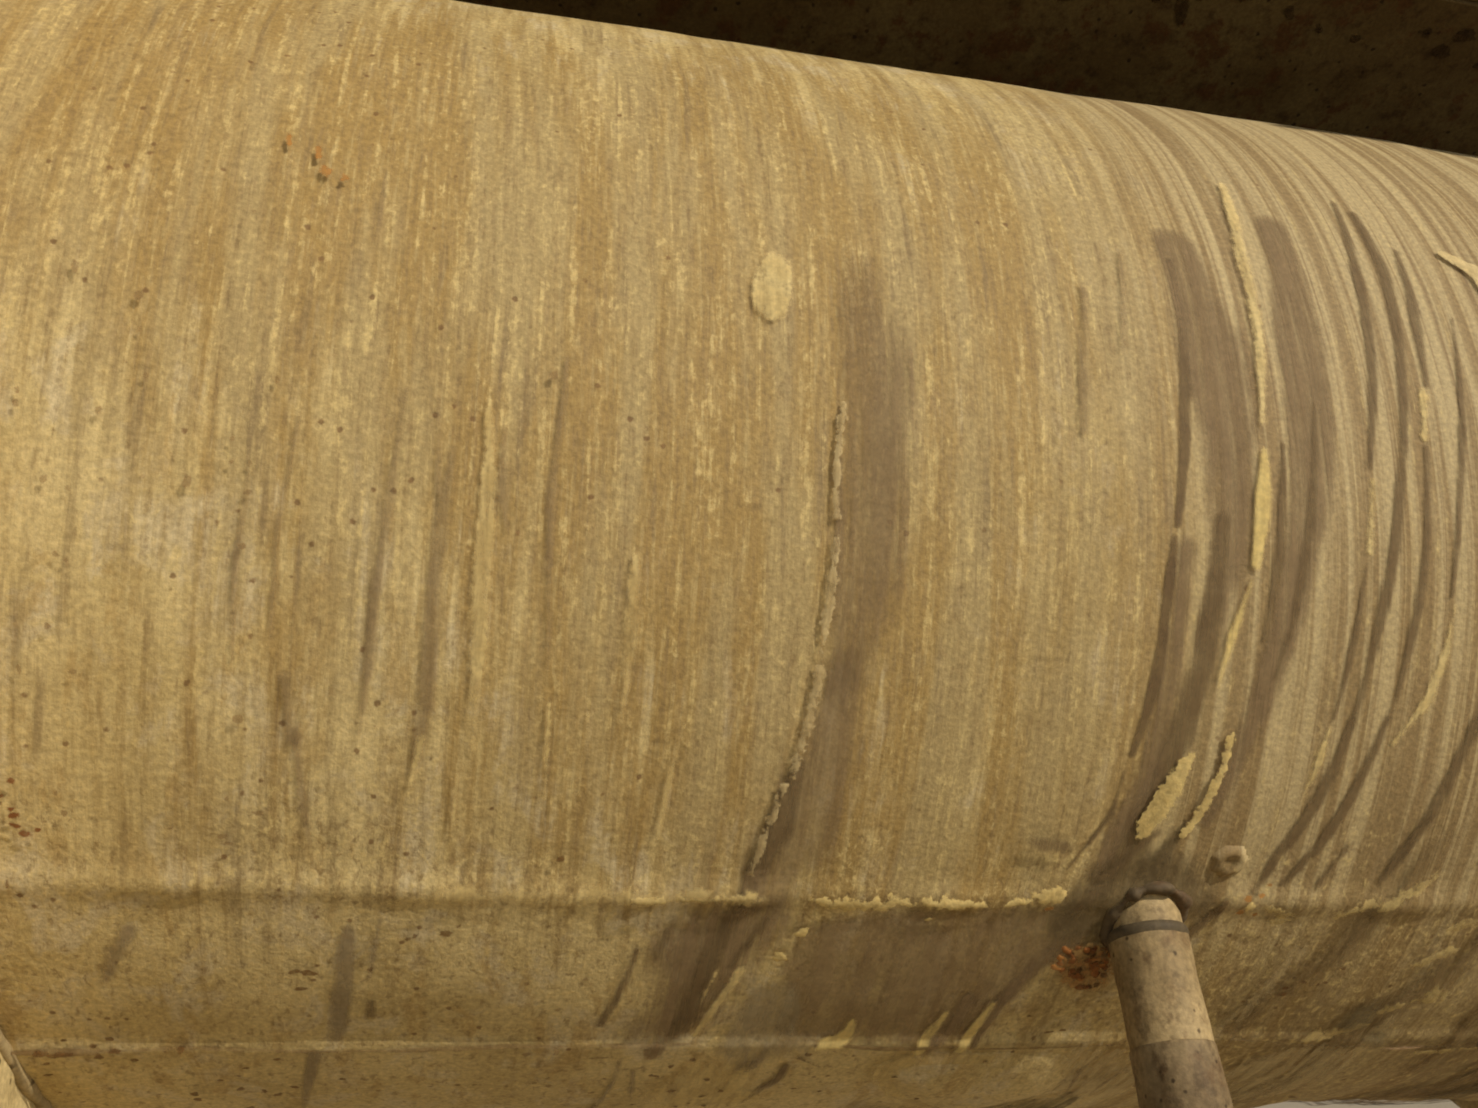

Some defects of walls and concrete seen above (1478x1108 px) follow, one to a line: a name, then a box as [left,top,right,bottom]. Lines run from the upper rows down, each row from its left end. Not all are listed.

water stain [1452,340,1467,596]
water stain [1253,202,1451,891]
water stain [725,183,1332,1106]
water stain [644,628,849,1060]
peeling [1135,753,1196,839]
peeling [1179,732,1236,839]
water stain [1380,717,1478,912]
peeling [808,885,1067,921]
water stain [597,949,639,1027]
peeling [692,966,745,1037]
rust [1051,943,1114,991]